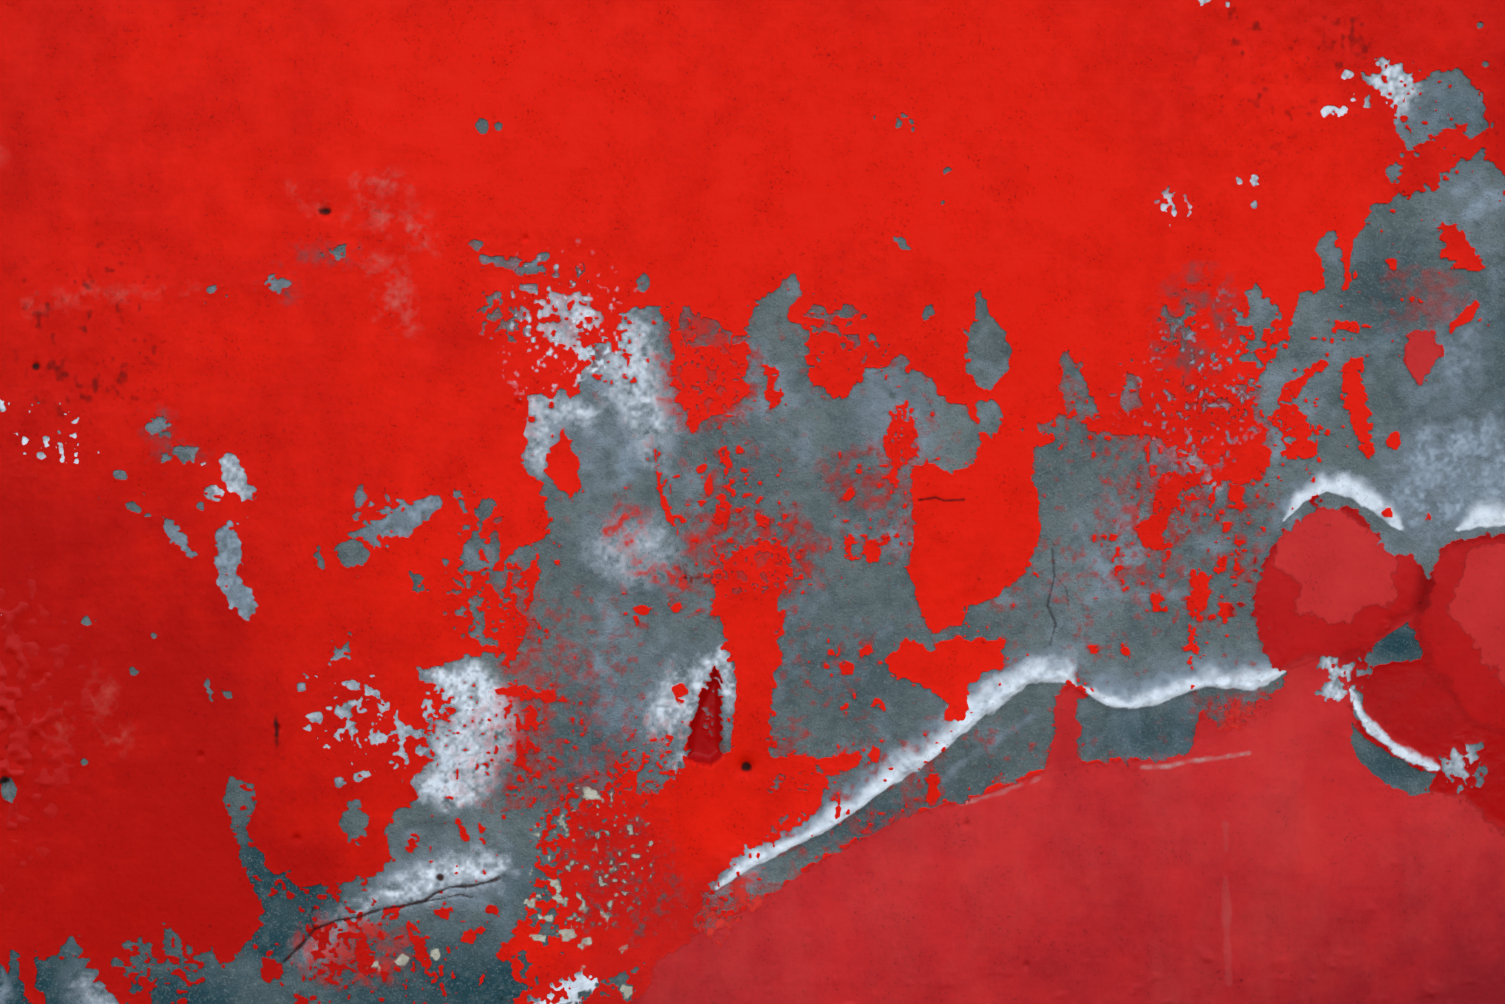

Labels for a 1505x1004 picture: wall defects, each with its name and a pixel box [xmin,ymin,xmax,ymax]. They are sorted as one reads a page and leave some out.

peeling [475,118,503,134]
peeling [895,113,915,132]
peeling [1361,57,1494,184]
peeling [111,148,1505,1004]
crack [284,877,499,962]
peeling [0,935,129,1004]